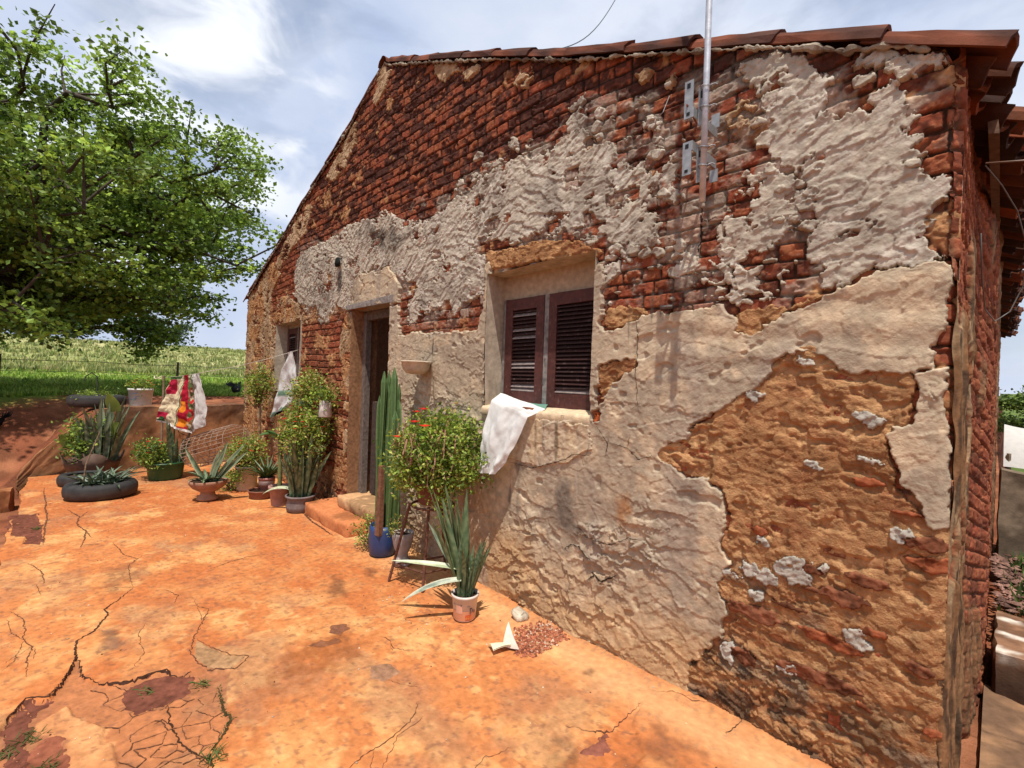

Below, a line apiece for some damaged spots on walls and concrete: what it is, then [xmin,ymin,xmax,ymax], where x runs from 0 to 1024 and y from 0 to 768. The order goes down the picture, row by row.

peeling [243,49,963,465]
crack [2,488,249,768]
spalling [658,345,951,768]